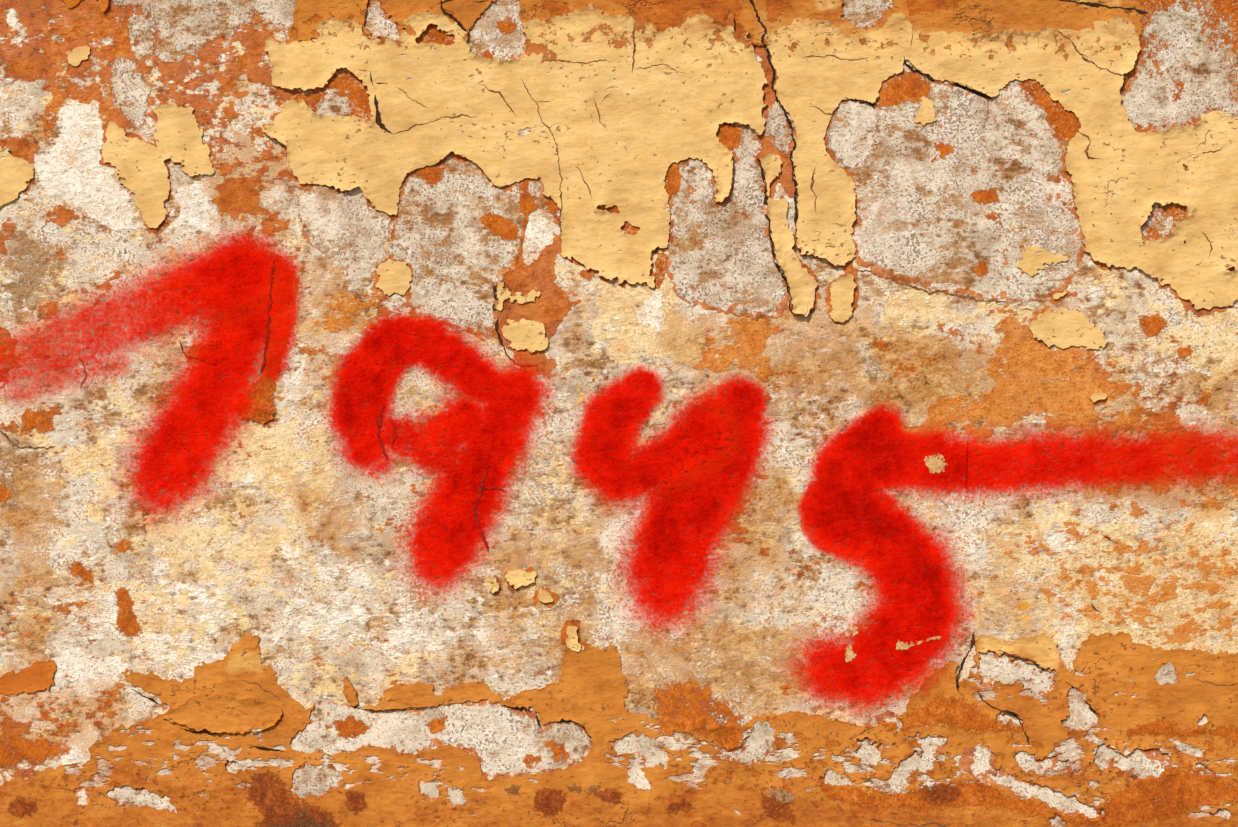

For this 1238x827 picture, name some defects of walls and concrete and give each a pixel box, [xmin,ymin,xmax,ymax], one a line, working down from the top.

peeling [66,46,91,67]
crack [904,31,993,99]
peeling [0,147,34,208]
peeling [99,0,1238,353]
crack [750,0,874,314]
peeling [238,340,283,425]
peeling [1176,343,1194,360]
peeling [111,587,146,638]
peeling [0,625,1238,827]